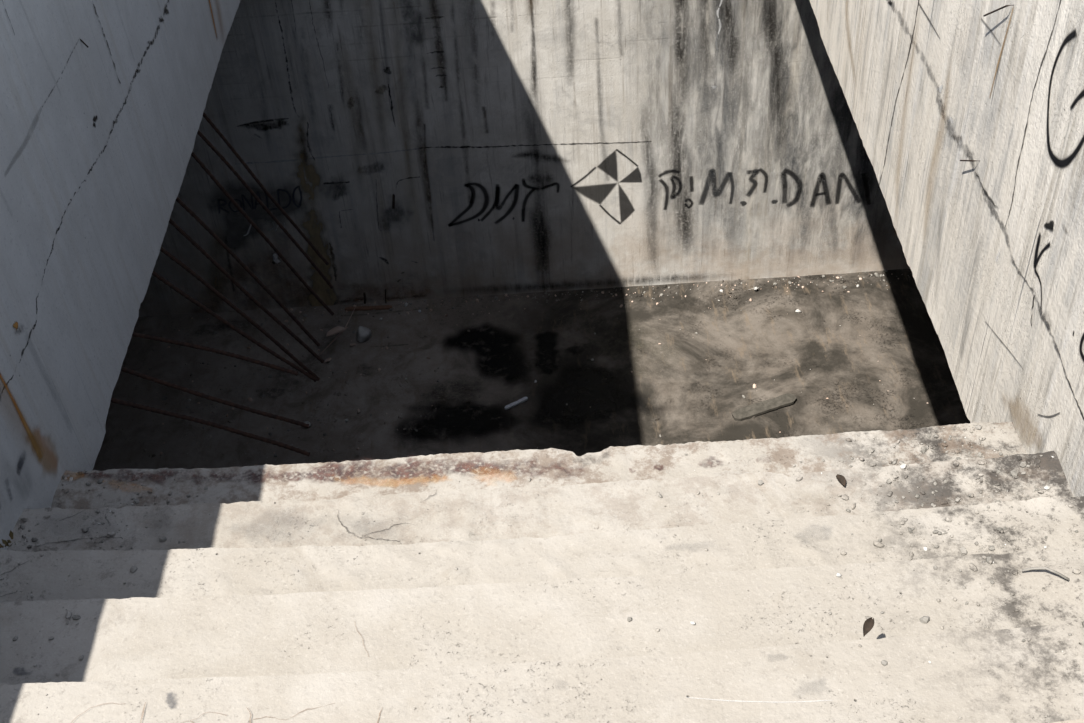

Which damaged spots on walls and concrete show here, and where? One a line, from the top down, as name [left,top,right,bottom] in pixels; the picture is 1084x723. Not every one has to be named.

crack [1,0,169,394]
crack [875,0,1084,419]
corrosion [0,374,42,459]